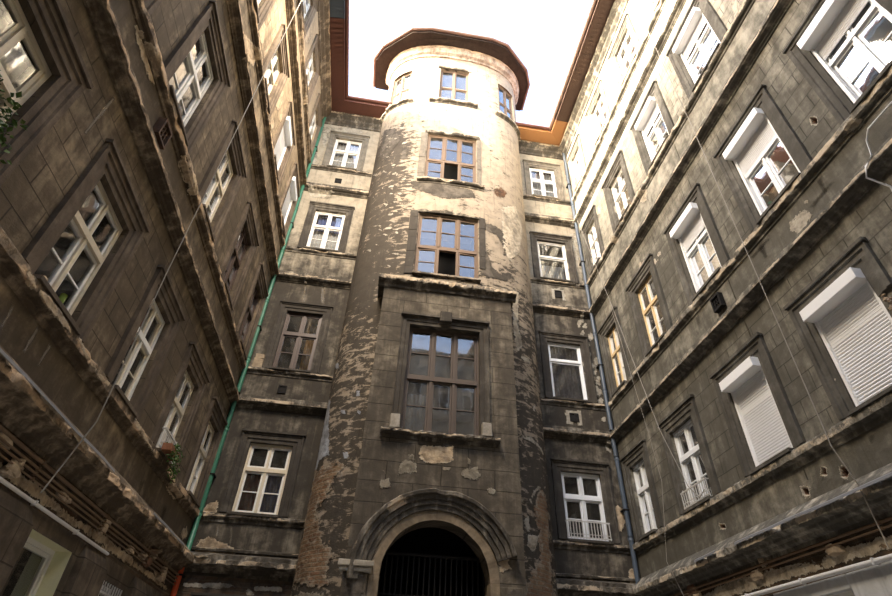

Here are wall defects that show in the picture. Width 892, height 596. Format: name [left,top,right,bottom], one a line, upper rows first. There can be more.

spalling [805,110,822,132]
peeling [372,125,408,236]
spalling [480,206,523,281]
spalling [512,289,530,364]
spalling [135,418,156,456]
spalling [379,445,481,489]
peeling [565,410,583,426]
spalling [797,460,855,503]
spalling [10,473,167,590]
spalling [704,535,892,596]